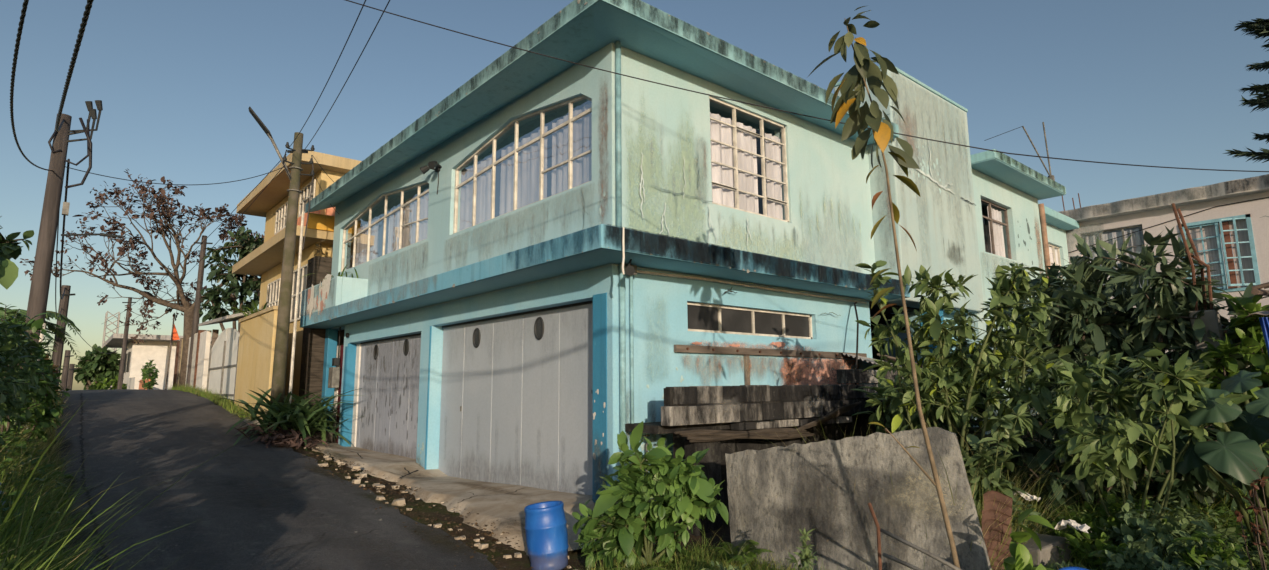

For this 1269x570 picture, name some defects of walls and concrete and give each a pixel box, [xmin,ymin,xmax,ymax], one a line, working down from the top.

damp [310,39,523,206]
damp [613,0,838,104]
damp [552,131,910,295]
crack [79,392,110,570]